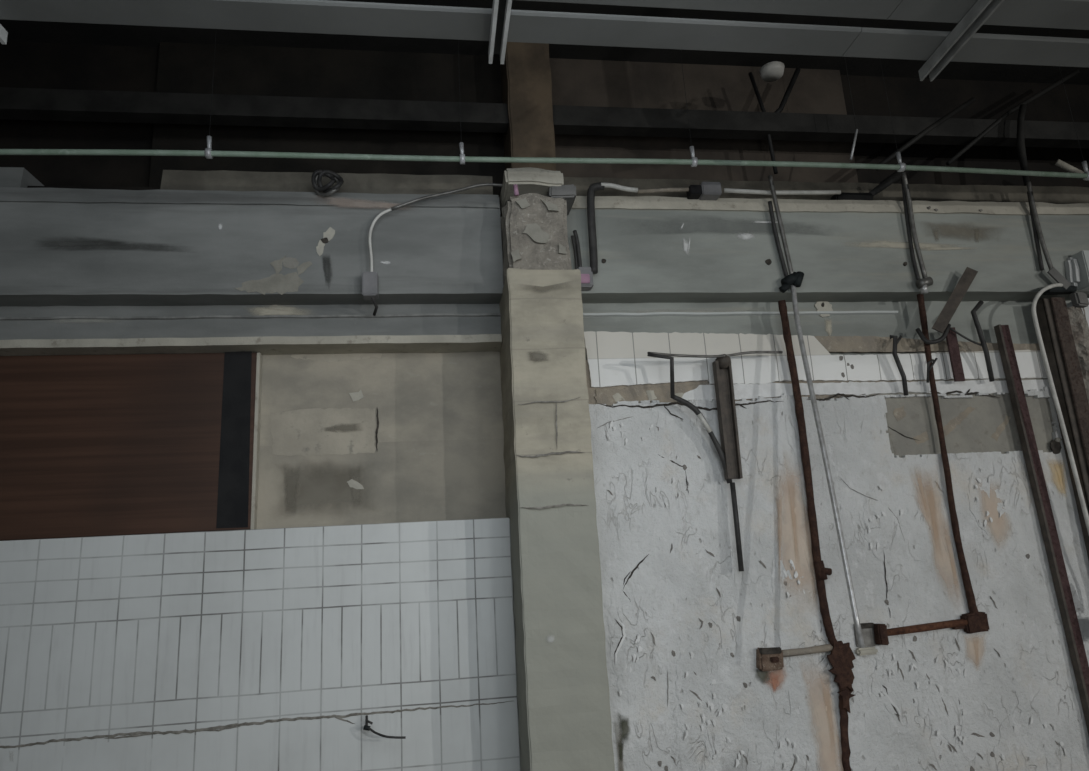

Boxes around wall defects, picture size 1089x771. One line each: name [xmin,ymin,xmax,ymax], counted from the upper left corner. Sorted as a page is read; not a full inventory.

damp [51,238,164,250]
spalling [234,227,335,295]
spalling [1067,306,1089,403]
crack [518,393,878,458]
flaking render [887,399,1022,455]
flaking render [1027,403,1048,448]
crack [520,502,589,510]
corrosion [781,479,813,587]
corrosion [918,486,955,582]
crack [614,554,649,664]
crack [0,701,509,748]
corrosion [810,680,839,771]